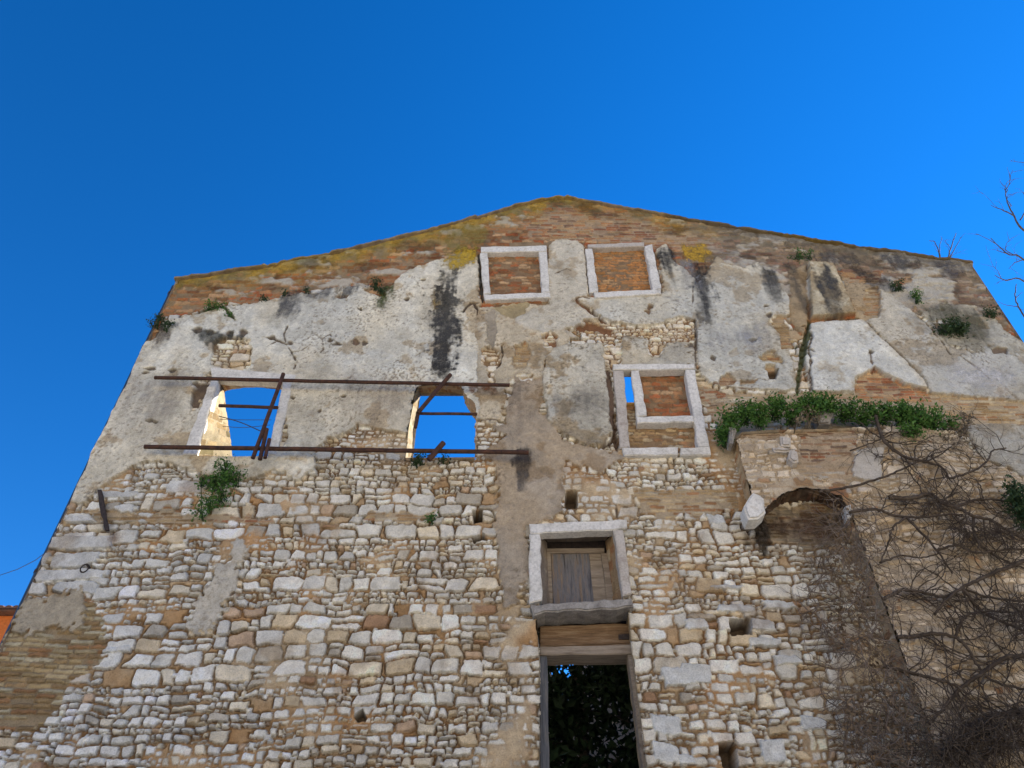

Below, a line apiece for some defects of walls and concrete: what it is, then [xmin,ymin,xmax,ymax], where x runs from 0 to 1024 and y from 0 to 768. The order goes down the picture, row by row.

damp [657,247,719,322]
damp [811,250,898,311]
damp [881,254,920,269]
spalling [191,327,252,411]
damp [423,268,462,377]
spalling [480,302,532,383]
spalling [541,331,558,348]
spalling [574,304,696,372]
crack [792,317,928,394]
spalling [315,425,411,470]